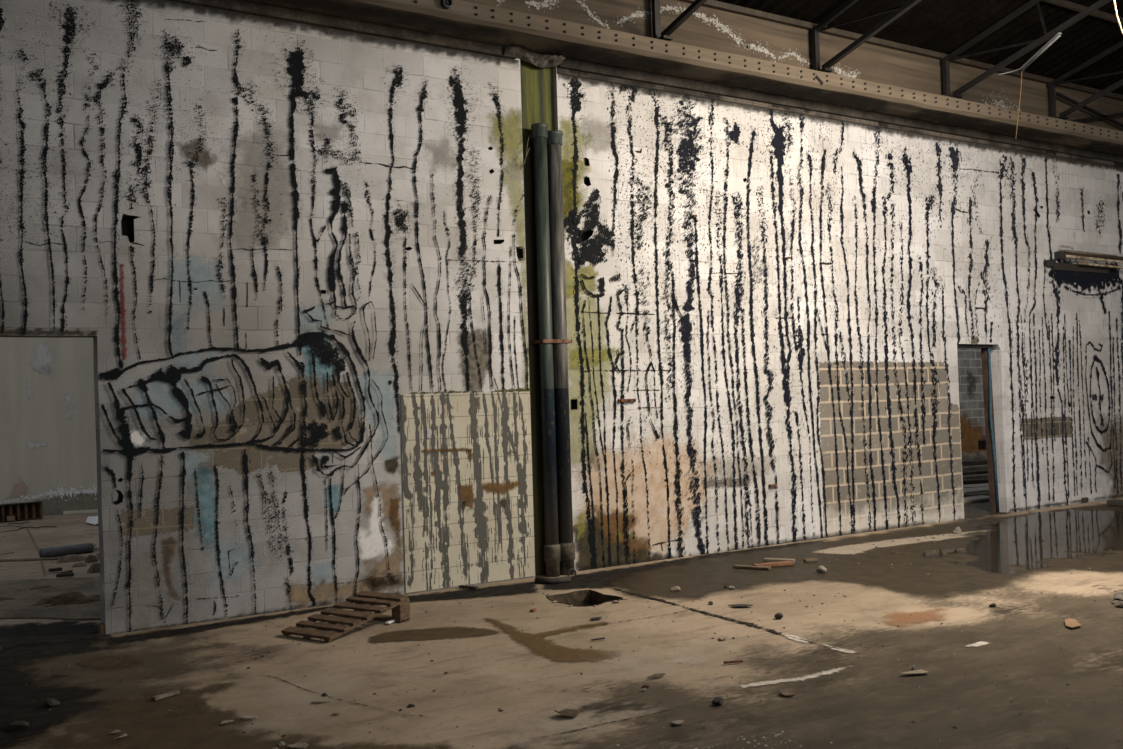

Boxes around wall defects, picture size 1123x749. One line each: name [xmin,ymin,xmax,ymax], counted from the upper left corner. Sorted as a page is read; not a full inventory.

leakage [576,0,813,66]
spalling [121,215,139,243]
leakage [301,336,334,384]
leakage [459,330,490,391]
leakage [34,493,98,516]
leakage [195,469,216,547]
peeling [358,485,404,592]
leakage [385,457,398,473]
rust [422,448,473,461]
rust [458,481,519,510]
rust [574,439,705,562]
leakage [573,422,1123,599]